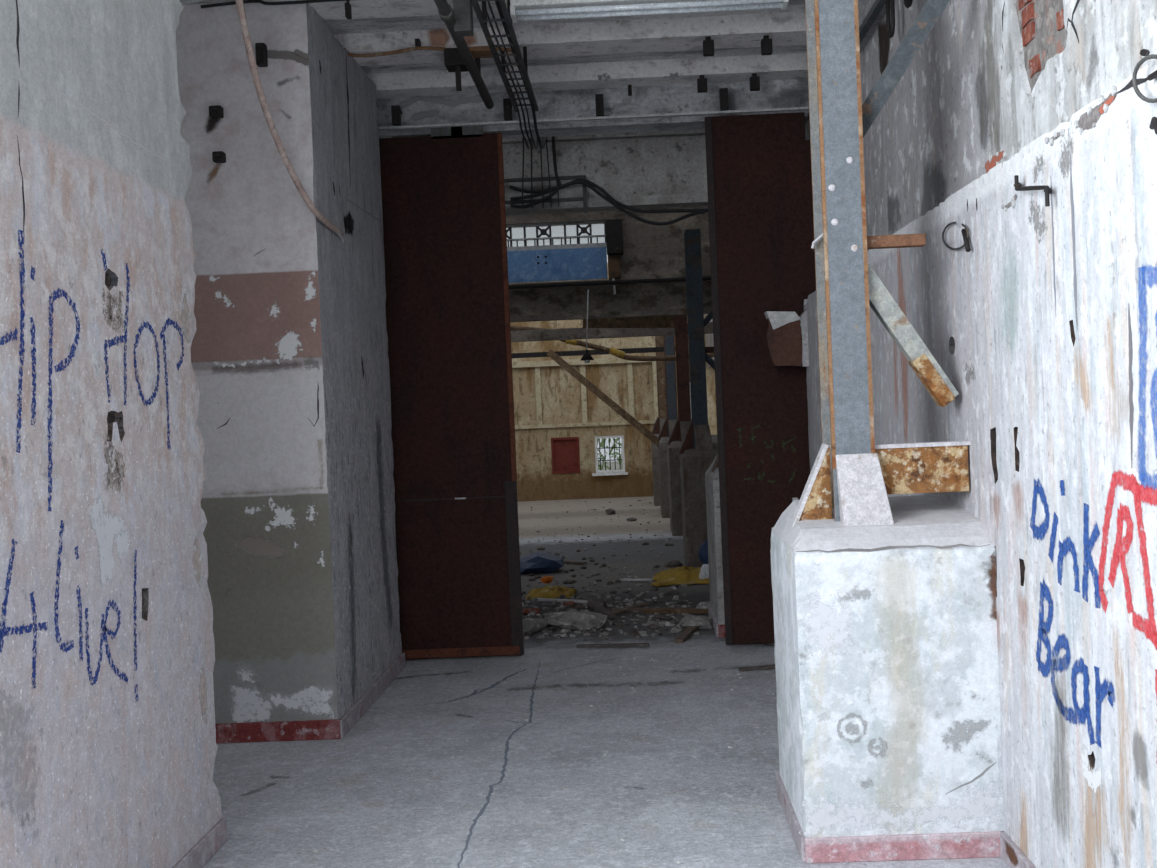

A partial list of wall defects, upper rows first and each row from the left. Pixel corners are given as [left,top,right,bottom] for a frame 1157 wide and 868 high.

spalling [1001,0,1068,102]
peeling [209,274,234,308]
peeling [304,271,316,301]
peeling [214,331,318,368]
peeling [245,497,318,548]
crack [419,654,646,868]